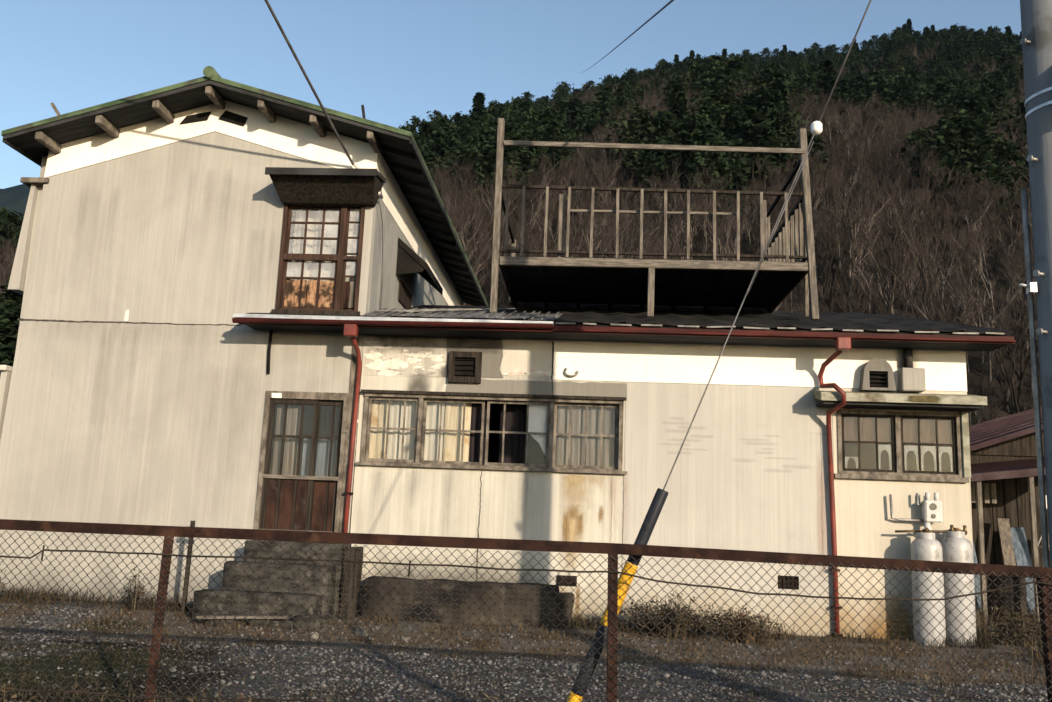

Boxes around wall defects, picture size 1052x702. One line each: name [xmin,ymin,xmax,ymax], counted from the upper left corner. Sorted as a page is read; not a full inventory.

peeling [363,336,446,376]
rust [566,475,584,495]
rust [563,509,582,555]